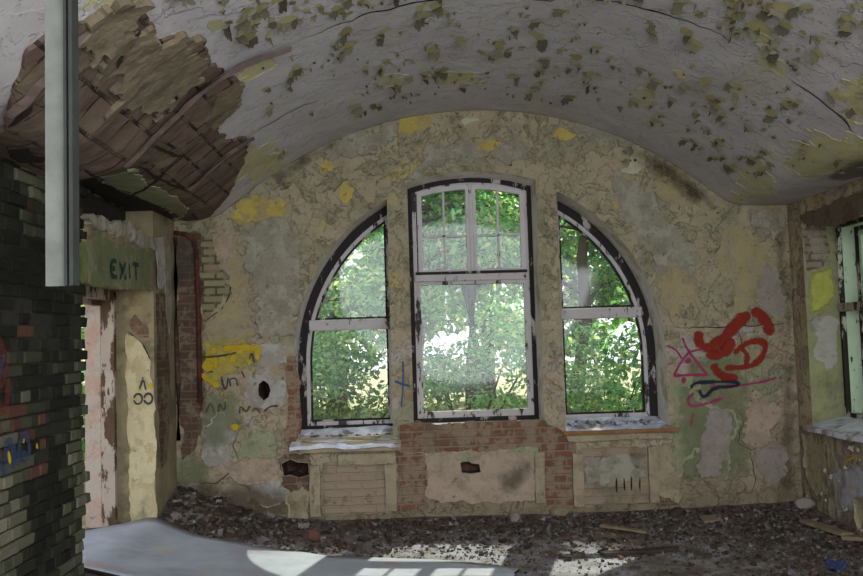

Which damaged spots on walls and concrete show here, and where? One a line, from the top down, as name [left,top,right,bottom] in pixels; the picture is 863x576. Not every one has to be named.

crack [292,0,435,45]
crack [595,0,744,48]
peeling [207,0,863,185]
crack [787,77,854,133]
peeling [755,266,787,317]
peeling [125,195,649,521]
peeling [812,315,840,370]